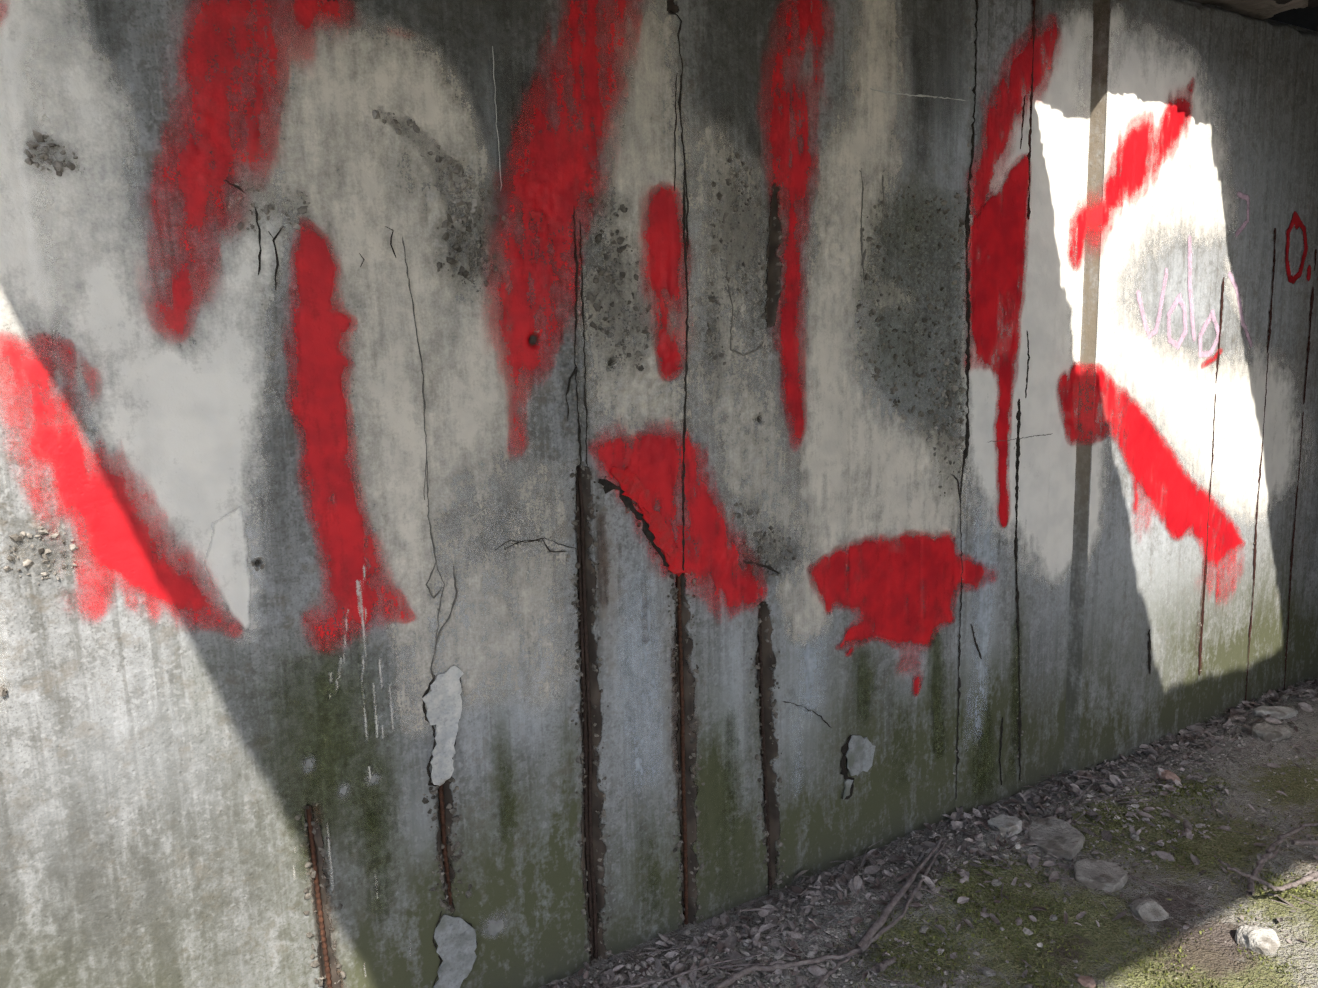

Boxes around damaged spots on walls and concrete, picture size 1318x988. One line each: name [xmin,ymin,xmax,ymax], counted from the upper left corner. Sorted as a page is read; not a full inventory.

crack [359,226,458,681]
crack [494,536,576,552]
water stain [976,509,992,688]
water stain [300,653,393,868]
peeling [421,665,478,988]
peeling [840,735,876,800]
water stain [929,631,944,755]